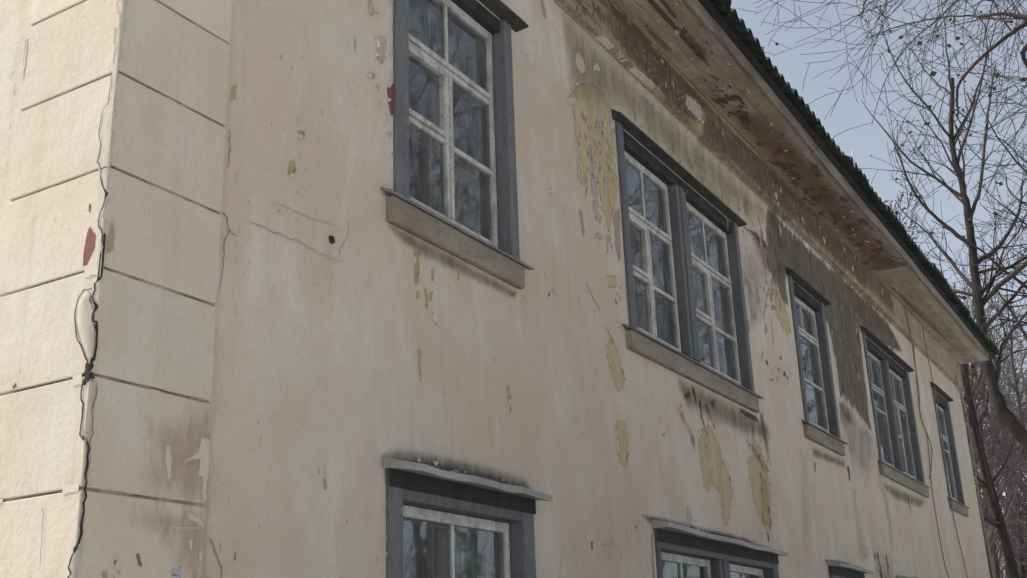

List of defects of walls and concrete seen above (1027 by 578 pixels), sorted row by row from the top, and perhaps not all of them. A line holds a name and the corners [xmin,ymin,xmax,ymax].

damp [577,47,748,209]
crack [67,2,120,578]
crack [219,202,344,291]
flaking render [566,0,901,428]
peeling [699,425,733,525]
peeling [747,435,775,540]